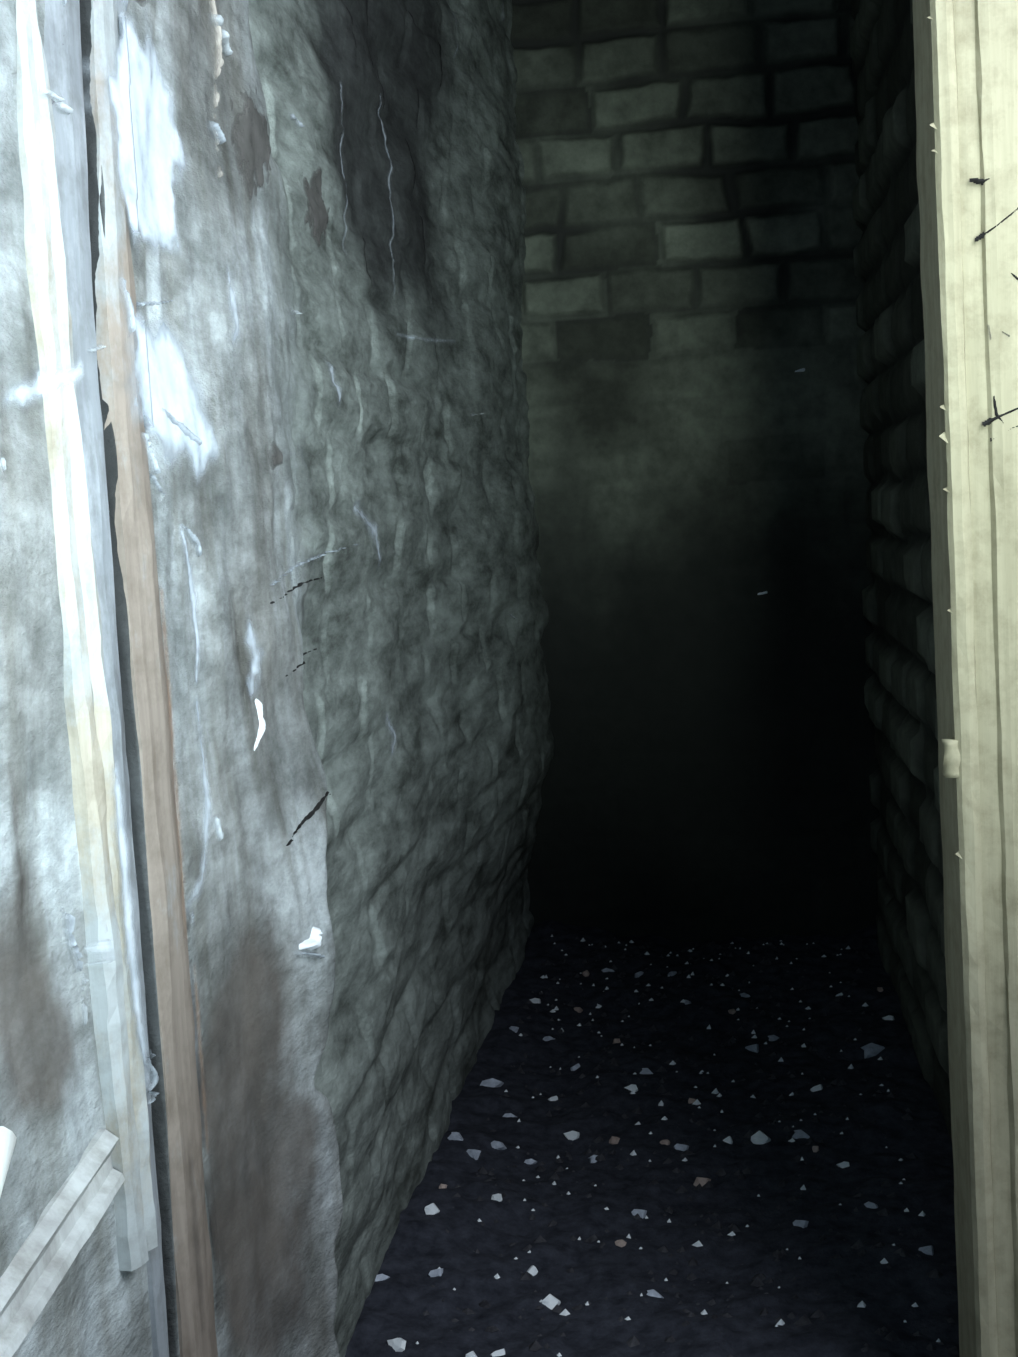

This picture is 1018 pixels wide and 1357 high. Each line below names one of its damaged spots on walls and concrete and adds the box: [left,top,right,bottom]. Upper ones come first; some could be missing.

peeling [109,0,184,248]
crack [270,544,358,604]
crack [286,791,331,846]